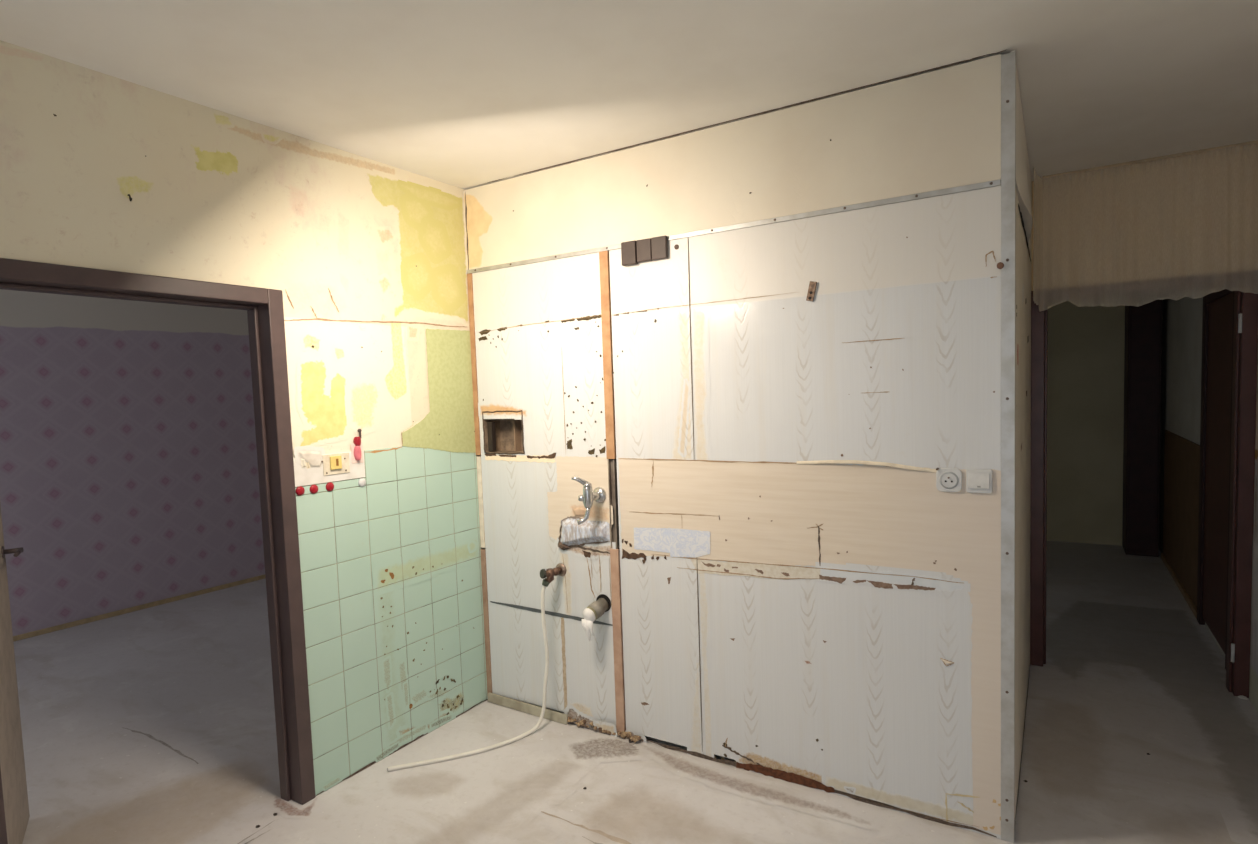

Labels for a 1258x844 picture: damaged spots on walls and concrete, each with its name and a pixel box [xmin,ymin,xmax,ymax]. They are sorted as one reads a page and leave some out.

peeling [113,172,158,203]
peeling [186,108,495,455]
peeling [485,455,1001,835]
damp [1017,597,1258,844]